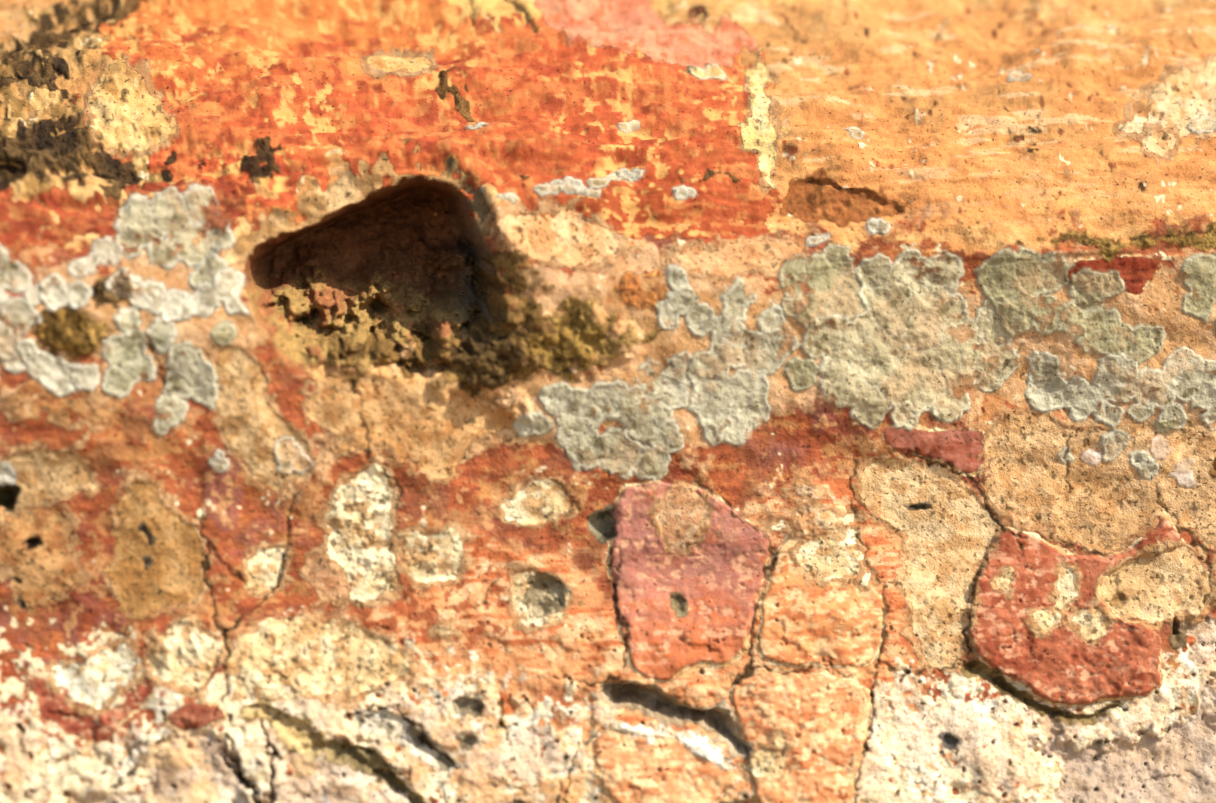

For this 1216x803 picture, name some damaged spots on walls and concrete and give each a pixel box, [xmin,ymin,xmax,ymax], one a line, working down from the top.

flaking render [83,53,180,160]
flaking render [360,47,440,79]
flaking render [738,55,790,192]
flaking render [489,195,630,272]
crack [893,449,1105,556]
crack [1063,428,1080,490]
crack [1156,486,1216,606]
crack [200,494,298,716]
crack [554,541,630,687]
crack [695,460,988,803]
crack [205,743,278,803]
crack [346,704,458,803]